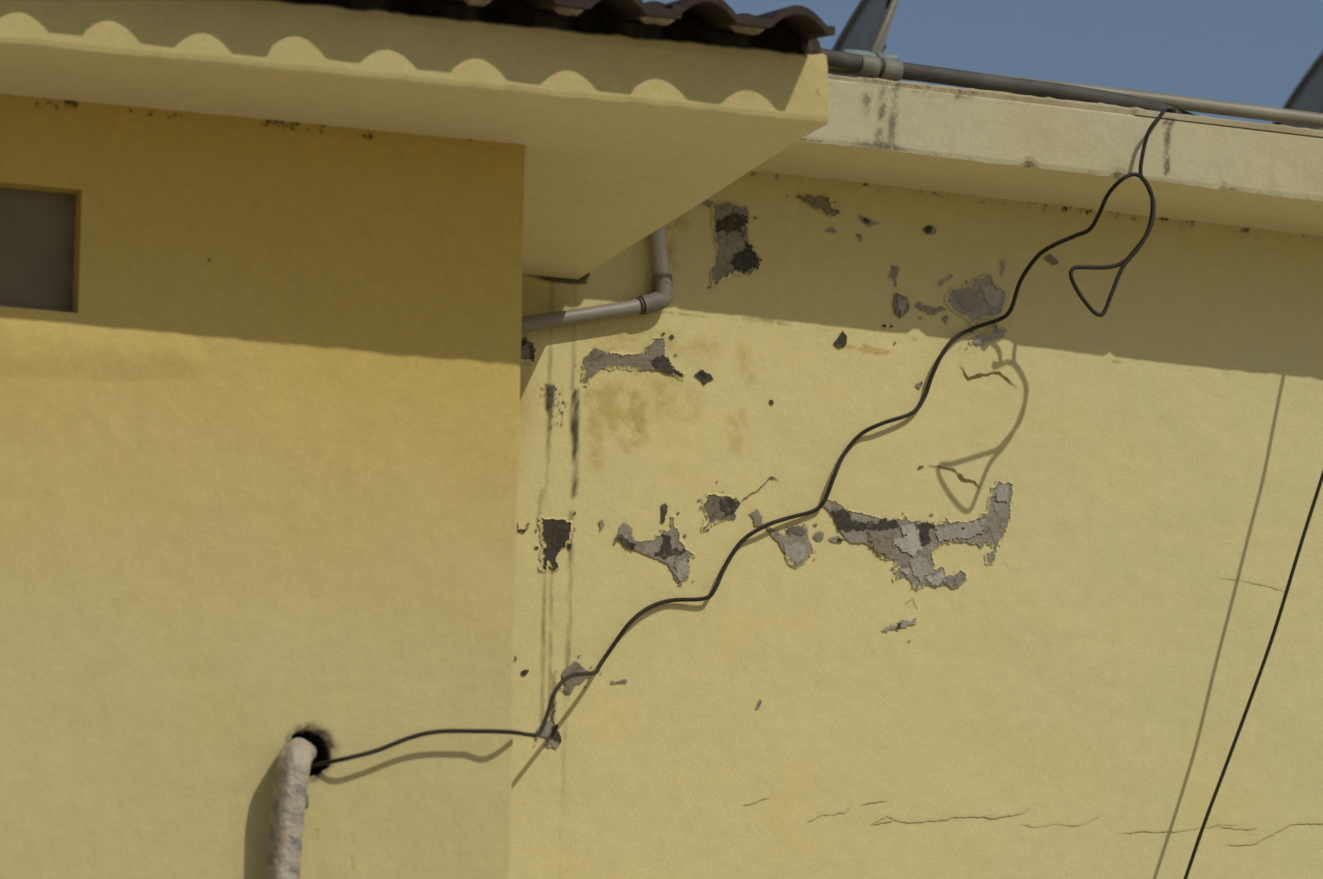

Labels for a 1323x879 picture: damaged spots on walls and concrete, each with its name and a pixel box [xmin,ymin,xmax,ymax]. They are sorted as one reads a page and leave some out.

peeling [700,199,762,289]
peeling [882,259,1007,349]
peeling [576,332,714,386]
crack [961,367,1014,385]
crack [918,465,980,488]
peeling [517,512,576,572]
peeling [599,479,1015,591]
peeling [560,655,627,694]
peeling [534,717,562,749]
crack [809,800,1323,845]